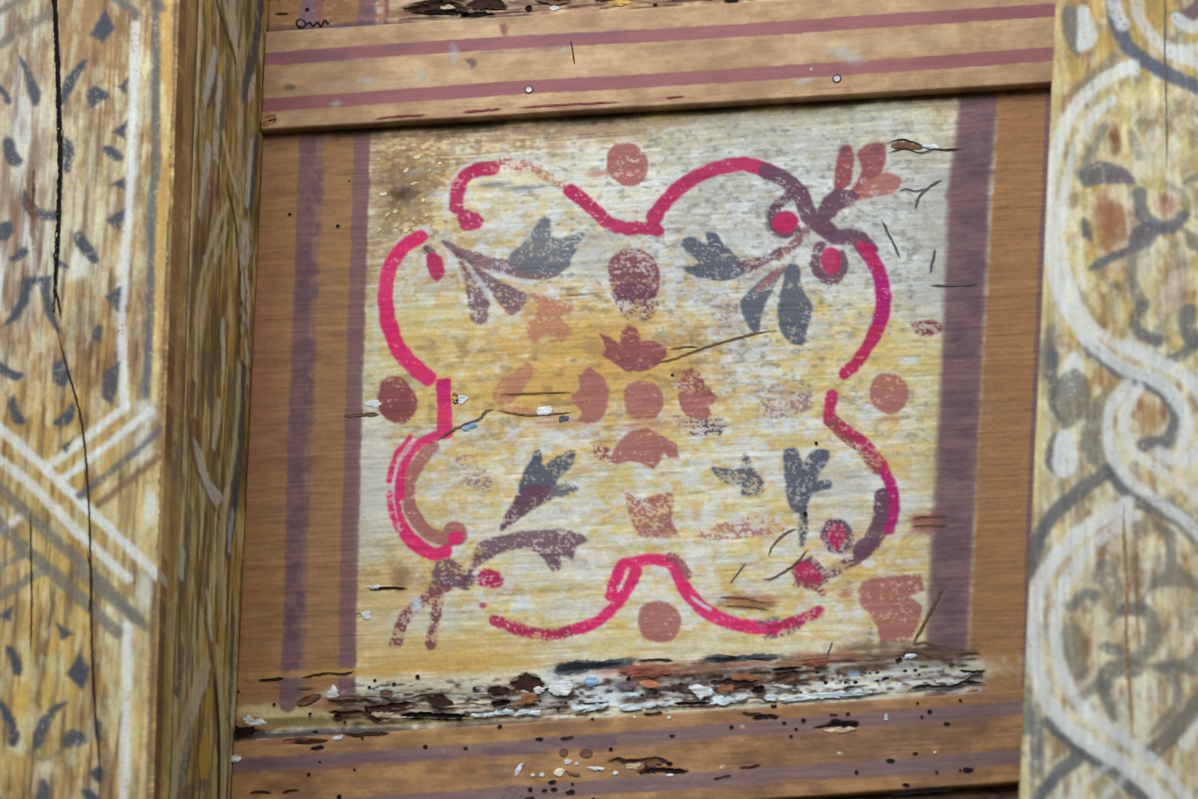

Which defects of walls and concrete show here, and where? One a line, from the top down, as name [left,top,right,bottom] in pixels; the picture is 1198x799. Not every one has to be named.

spalling [403,0,507,18]
spalling [525,0,570,12]
crack [1162,0,1170,165]
peeling [888,138,963,153]
crack [657,331,770,363]
crack [52,0,100,785]
crack [345,410,378,418]
crack [437,392,570,441]
spalling [364,690,410,718]
spalling [428,695,454,707]
flaking render [470,672,673,717]
flaking render [689,672,880,706]